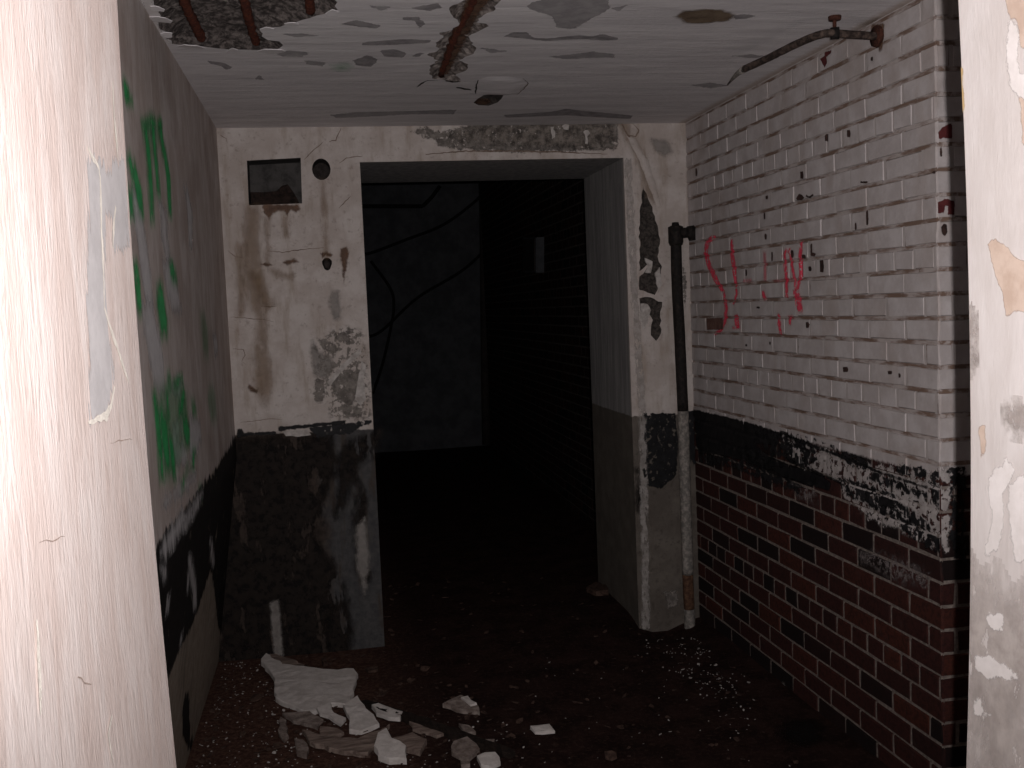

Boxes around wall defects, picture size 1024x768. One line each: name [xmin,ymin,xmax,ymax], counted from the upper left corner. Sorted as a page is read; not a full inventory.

spalling [141,0,380,69]
spalling [353,0,505,87]
flaking render [331,109,632,153]
peeling [86,154,130,421]
peeling [156,292,372,679]
damp [218,428,381,662]
peeling [624,159,1024,768]
peeling [182,691,193,750]